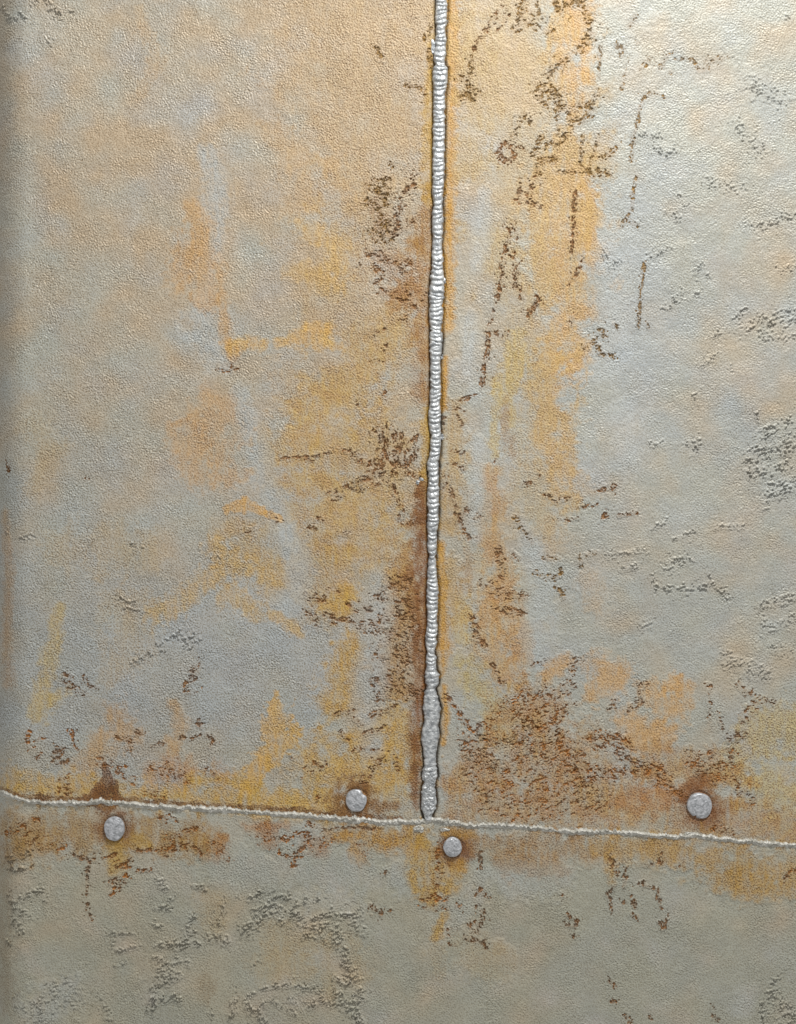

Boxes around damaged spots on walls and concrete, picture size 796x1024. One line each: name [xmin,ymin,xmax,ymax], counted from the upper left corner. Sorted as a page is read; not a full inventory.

rust [0,0,437,878]
rust [434,0,630,759]
rust [399,740,796,992]
rust [556,642,796,844]